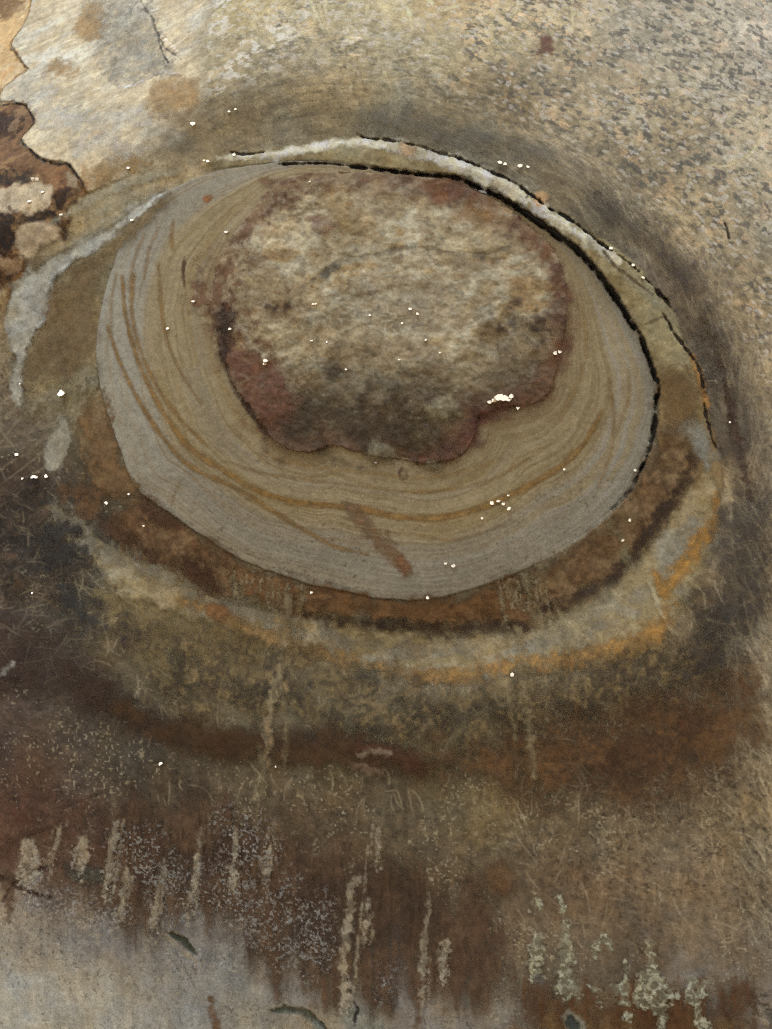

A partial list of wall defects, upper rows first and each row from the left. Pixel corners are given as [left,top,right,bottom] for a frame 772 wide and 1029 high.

crack [145,8,176,63]
spalling [0,101,166,480]
rust [107,274,603,576]
rust [56,390,719,685]
crack [231,136,752,510]
water stain [0,478,772,1029]